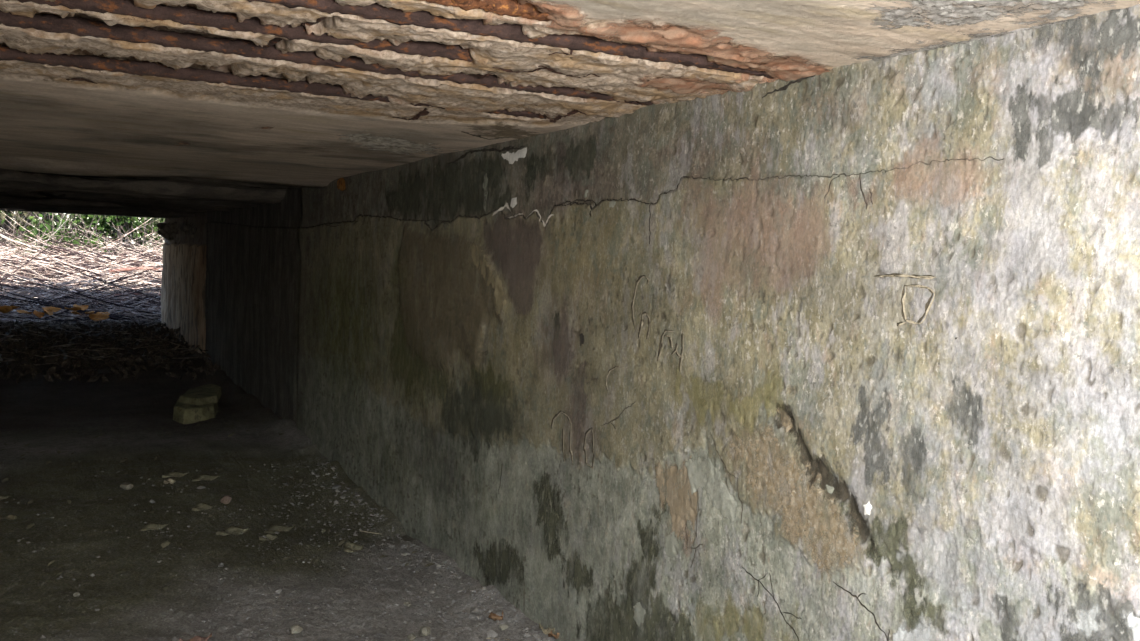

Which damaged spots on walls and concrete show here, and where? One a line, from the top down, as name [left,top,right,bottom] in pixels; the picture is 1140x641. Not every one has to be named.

spalling [0,0,830,106]
crack [445,132,524,166]
spalling [486,109,547,119]
crack [205,156,1004,353]
damp [533,471,593,603]
damp [637,456,698,562]
mould [866,516,947,633]